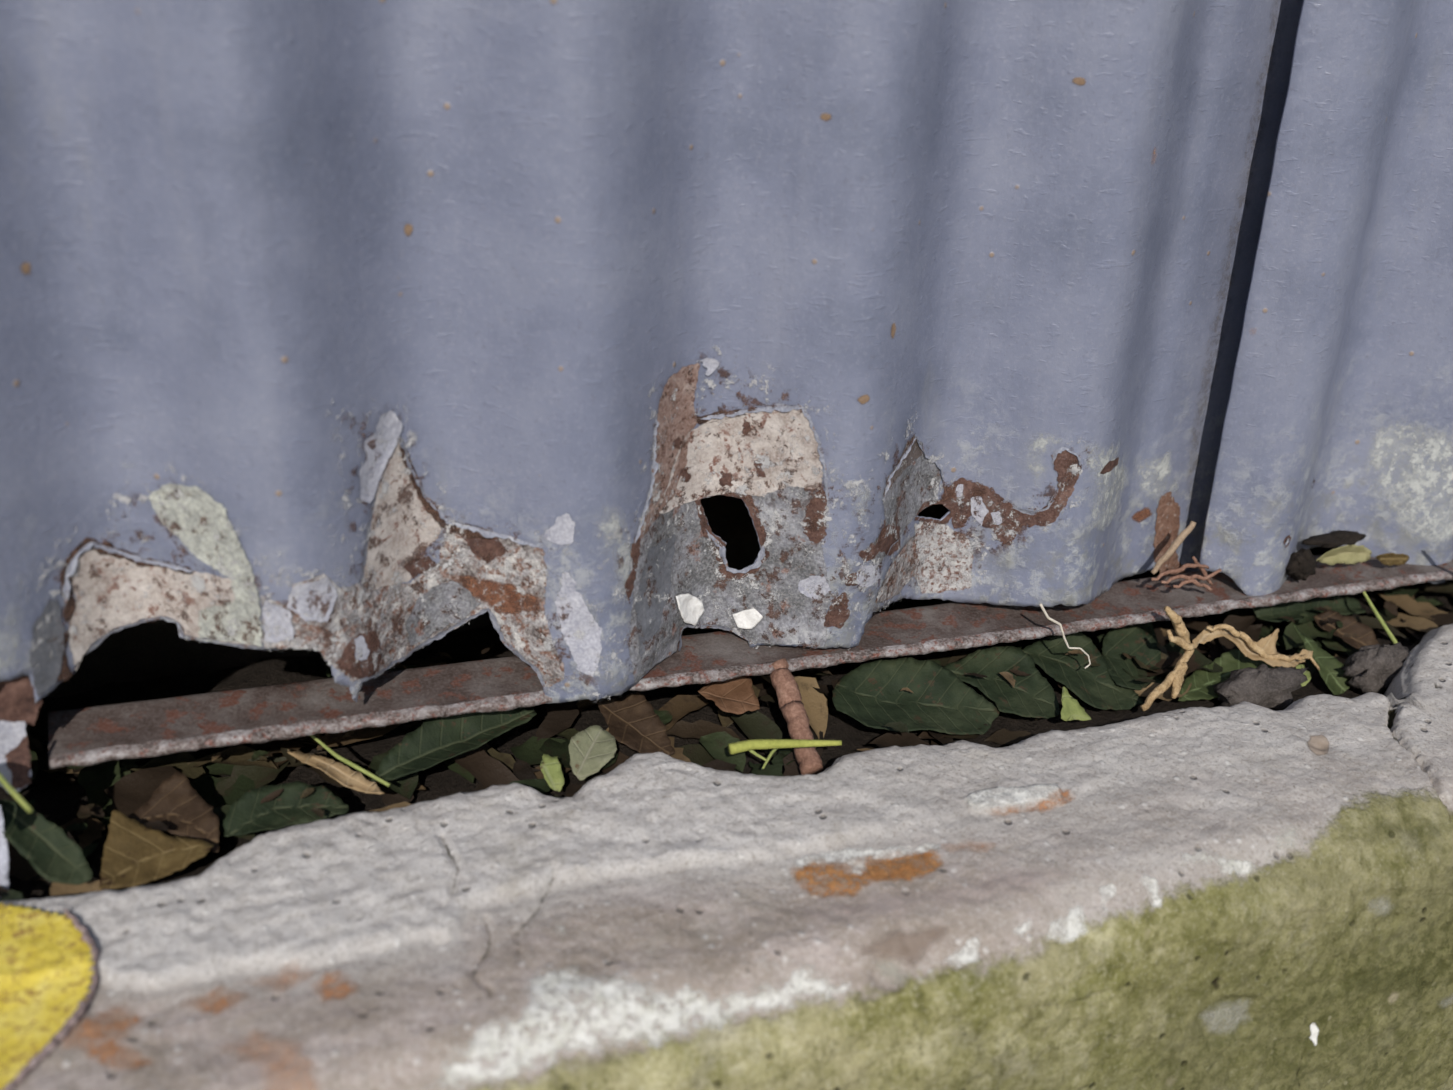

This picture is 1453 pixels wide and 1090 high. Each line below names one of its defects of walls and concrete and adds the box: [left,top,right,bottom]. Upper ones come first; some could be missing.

peeling [331,402,576,613]
peeling [634,347,848,659]
corrosion [619,415,1119,667]
peeling [913,520,974,594]
water stain [1370,426,1453,540]
peeling [555,572,602,677]
crack [1387,697,1405,740]
corrosion [795,843,942,896]
efflorescence [442,969,848,1089]